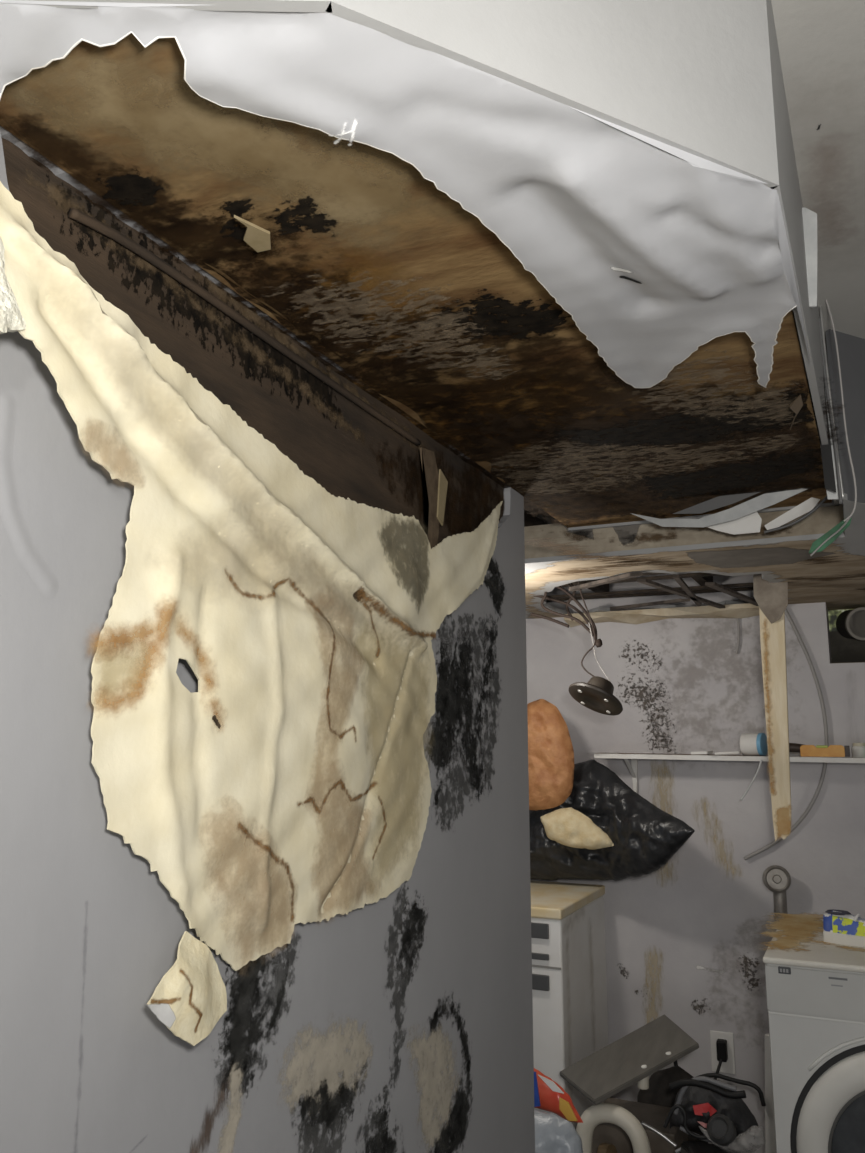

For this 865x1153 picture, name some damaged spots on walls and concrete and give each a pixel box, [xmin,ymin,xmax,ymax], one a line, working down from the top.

peeling [0,0,811,495]
leakage [4,39,842,535]
leakage [377,451,429,605]
leakage [225,570,356,741]
leakage [358,557,505,830]
leakage [618,640,676,754]
leakage [238,823,294,920]
leakage [298,780,387,859]
leakage [190,935,300,1153]
leakage [292,885,428,1153]
leakage [429,994,473,1153]